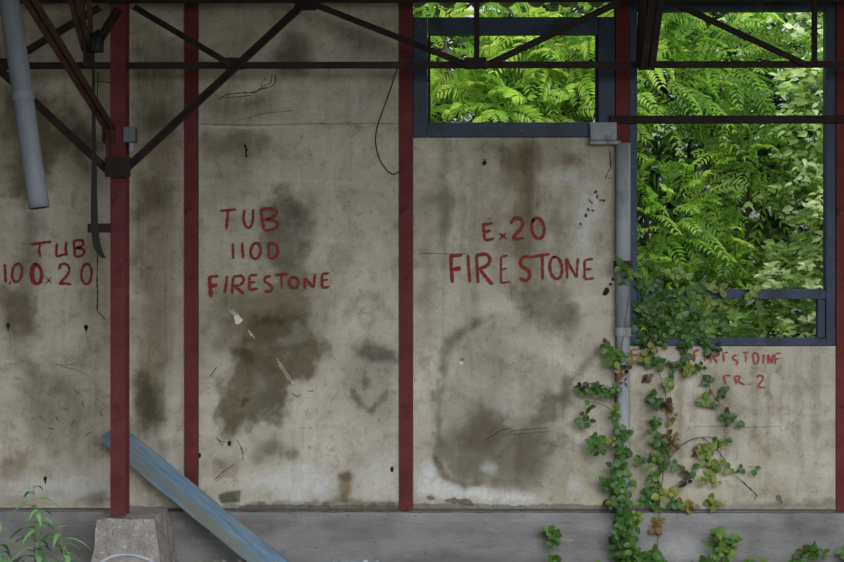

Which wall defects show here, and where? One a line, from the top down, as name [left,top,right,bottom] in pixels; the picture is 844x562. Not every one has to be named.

water stain [36,110,75,158]
water stain [218,313,318,432]
water stain [419,465,493,501]